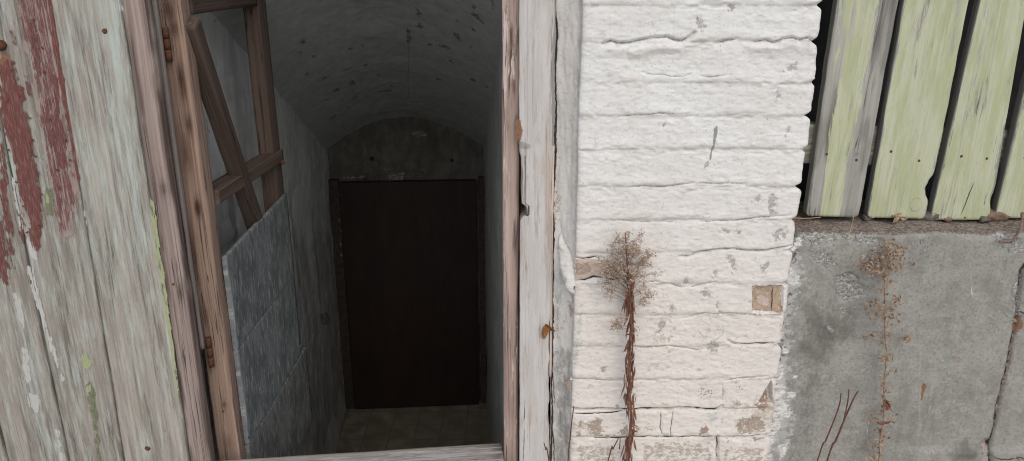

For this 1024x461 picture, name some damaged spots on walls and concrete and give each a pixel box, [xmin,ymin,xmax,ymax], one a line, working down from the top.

peeling [0,0,87,382]
spalling [574,258,619,279]
spalling [749,262,783,316]
peeling [21,346,44,413]
crack [983,263,1024,461]